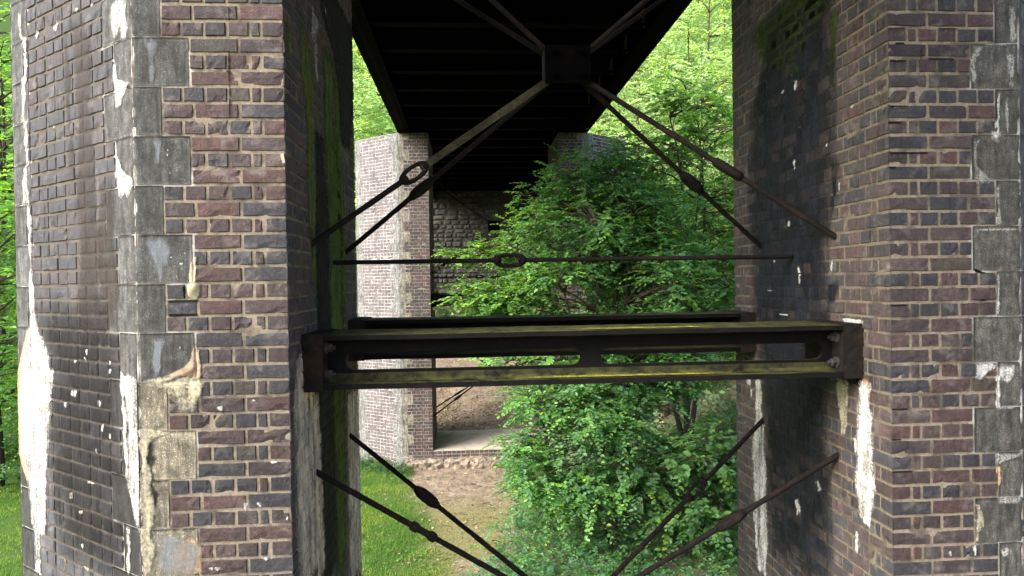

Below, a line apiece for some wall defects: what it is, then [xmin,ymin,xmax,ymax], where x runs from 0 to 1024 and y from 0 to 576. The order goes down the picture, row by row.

leakage [111,1,127,38]
leakage [64,29,132,319]
leakage [17,14,54,572]
spalling [147,346,201,386]
leakage [101,361,141,573]
leakage [747,379,768,576]
leakage [836,378,876,553]